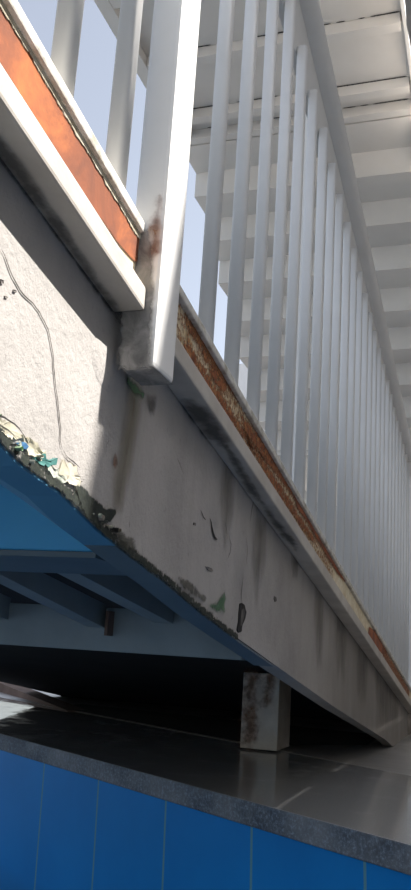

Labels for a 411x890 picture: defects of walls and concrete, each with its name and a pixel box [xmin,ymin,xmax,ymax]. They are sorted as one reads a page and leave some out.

rust [0,0,159,262]
crack [1,249,81,478]
flaking render [0,414,238,640]
rust [177,304,345,581]
rust [368,627,409,695]